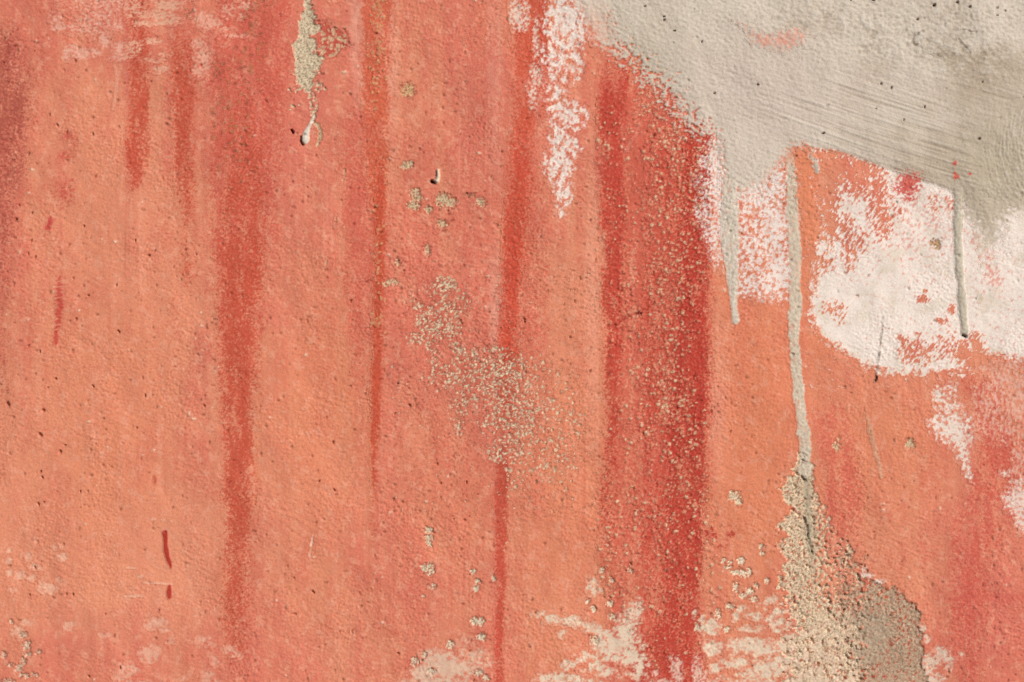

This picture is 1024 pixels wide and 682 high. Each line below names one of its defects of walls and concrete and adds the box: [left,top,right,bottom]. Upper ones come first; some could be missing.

water stain [166,0,300,681]
spalling [287,0,349,148]
peeling [361,0,417,111]
water stain [464,0,552,400]
water stain [593,46,720,682]
spalling [370,0,965,682]
water stain [491,463,512,682]